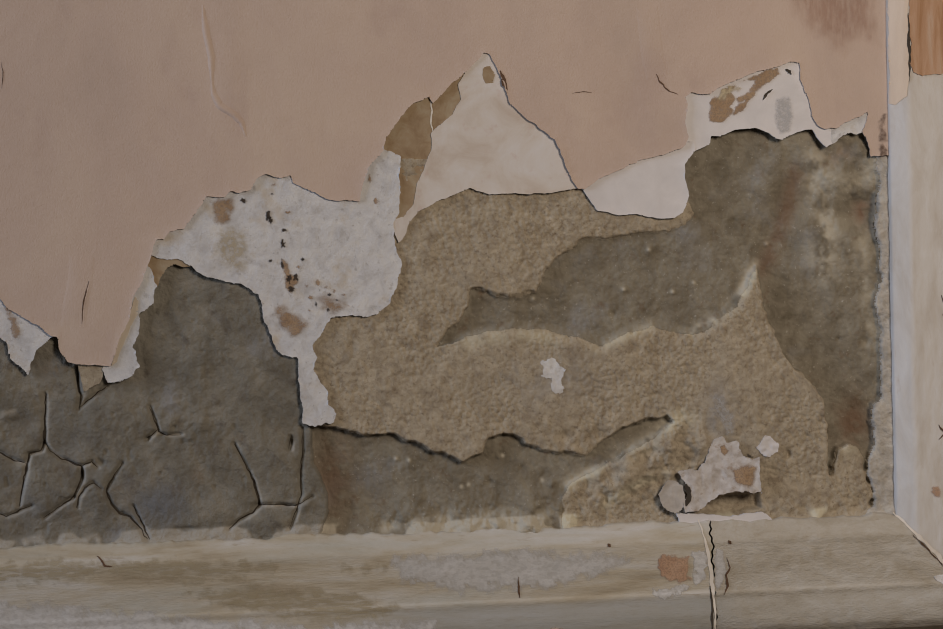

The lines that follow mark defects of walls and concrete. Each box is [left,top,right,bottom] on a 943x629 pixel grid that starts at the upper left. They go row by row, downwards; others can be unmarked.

peeling [886,0,943,105]
flaking render [0,53,896,549]
crack [0,396,150,539]
crack [229,436,312,529]
crack [698,520,731,629]